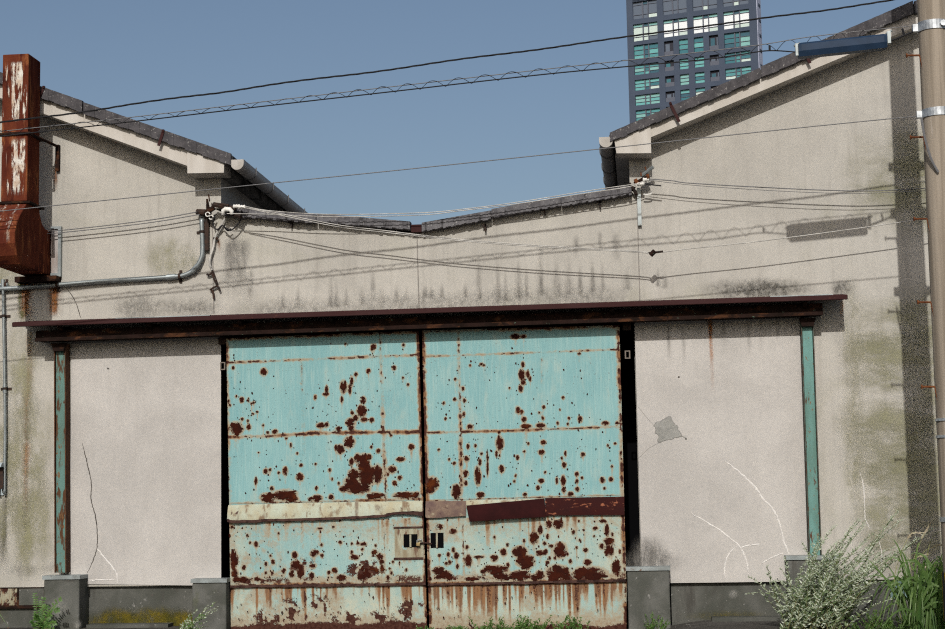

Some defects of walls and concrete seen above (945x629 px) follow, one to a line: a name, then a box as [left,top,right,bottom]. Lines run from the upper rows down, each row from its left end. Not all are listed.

rust [21,284,31,315]
rust [49,287,58,312]
rust [506,354,534,398]
rust [228,363,622,504]
spalling [639,408,686,457]
crack [82,443,118,584]
rust [229,520,407,614]
rust [426,515,621,619]
crack [691,461,789,579]